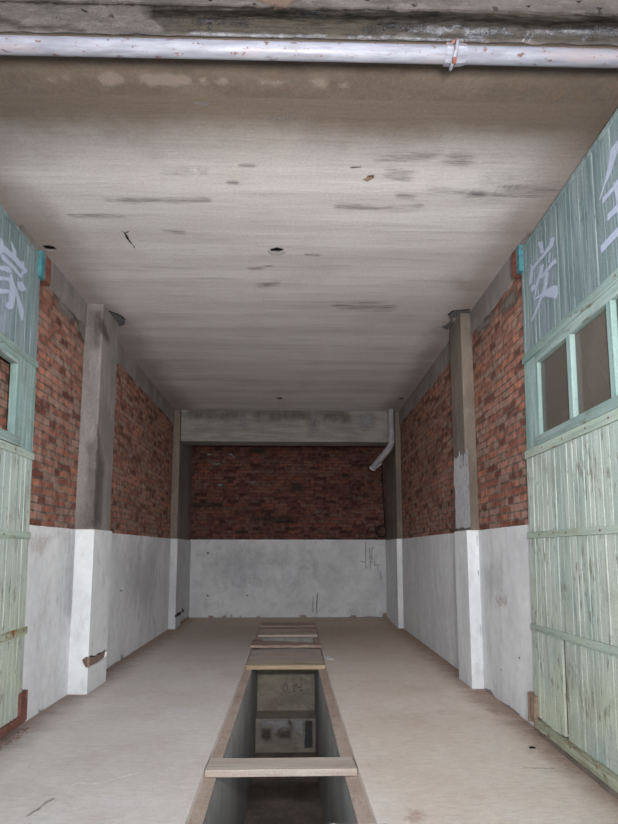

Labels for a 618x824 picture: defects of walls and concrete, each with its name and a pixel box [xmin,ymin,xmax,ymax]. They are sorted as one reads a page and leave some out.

spalling [253,0,295,8]